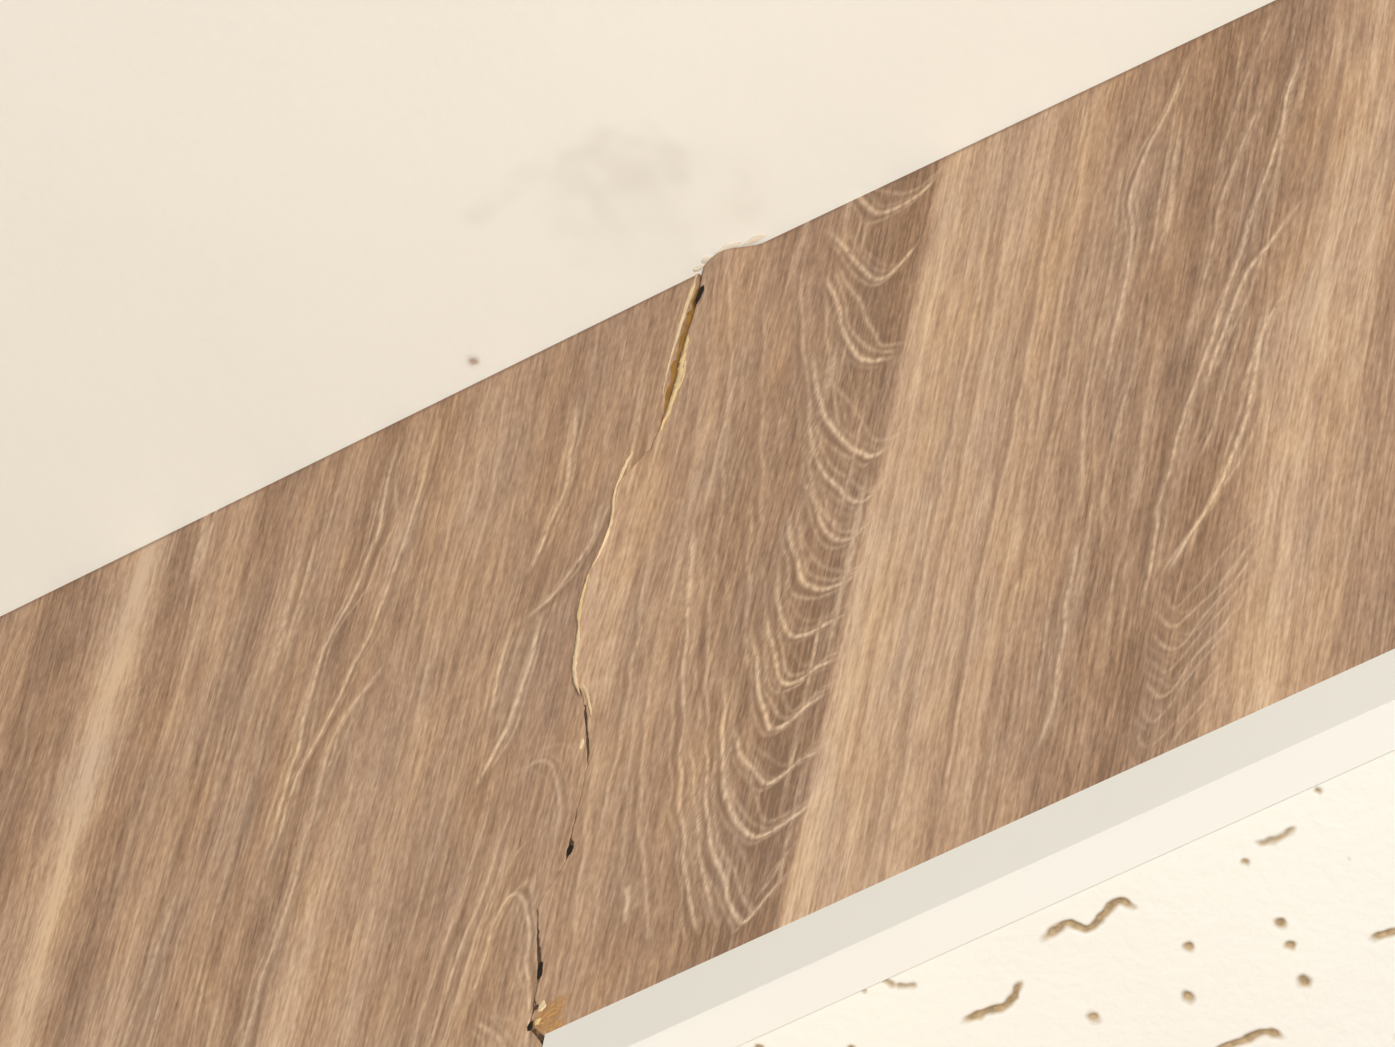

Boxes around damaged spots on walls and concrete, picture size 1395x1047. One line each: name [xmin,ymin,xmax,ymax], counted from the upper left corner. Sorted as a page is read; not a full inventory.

crack [660,273,704,431]
crack [579,705,589,762]
crack [566,811,577,860]
crack [527,926,544,1043]